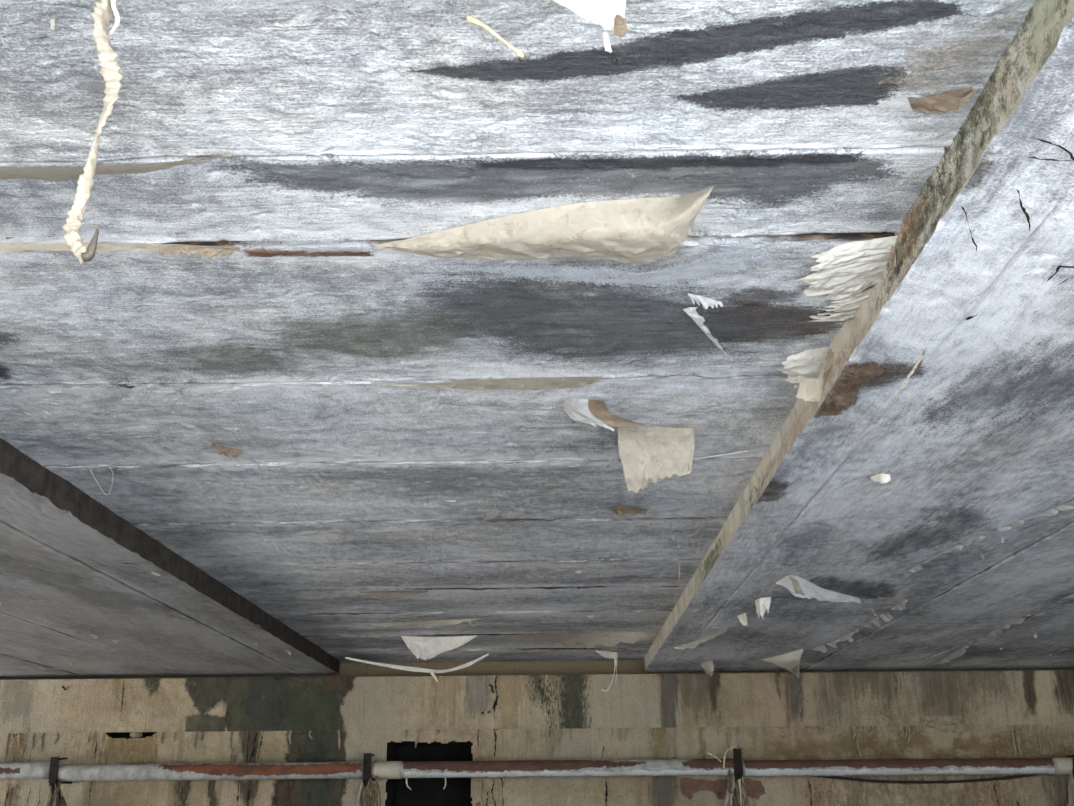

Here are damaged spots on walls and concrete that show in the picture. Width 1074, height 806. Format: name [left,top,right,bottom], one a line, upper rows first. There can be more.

peeling [870,474,891,484]
peeling [907,500,1074,572]
peeling [812,599,911,653]
water stain [524,675,592,729]
water stain [658,674,678,728]
water stain [708,673,719,711]
water stain [775,673,803,720]
water stain [1023,671,1037,714]
water stain [1054,670,1074,713]
water stain [100,732,157,764]